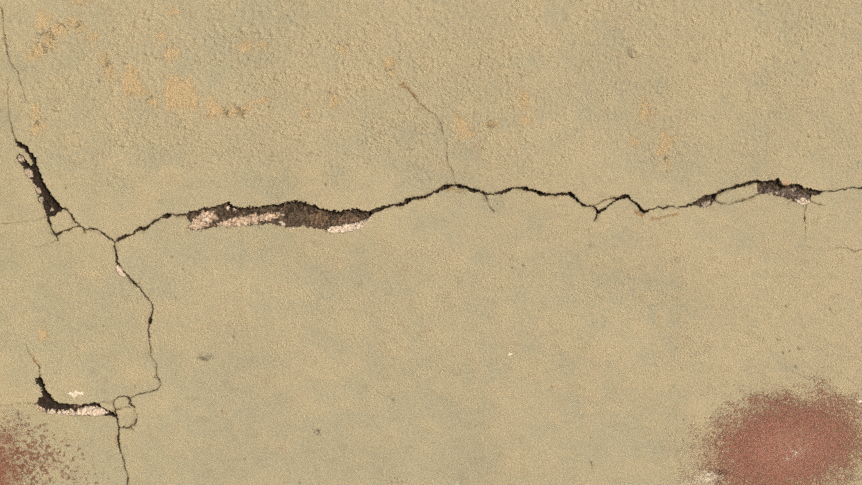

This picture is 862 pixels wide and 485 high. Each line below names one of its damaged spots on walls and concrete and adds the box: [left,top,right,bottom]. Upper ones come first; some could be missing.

spalling [16,100,63,217]
spalling [184,200,374,234]
crack [370,184,689,221]
spalling [689,193,716,207]
crack [714,180,759,204]
spalling [756,178,822,206]
crack [46,208,185,485]
spalling [35,377,117,417]